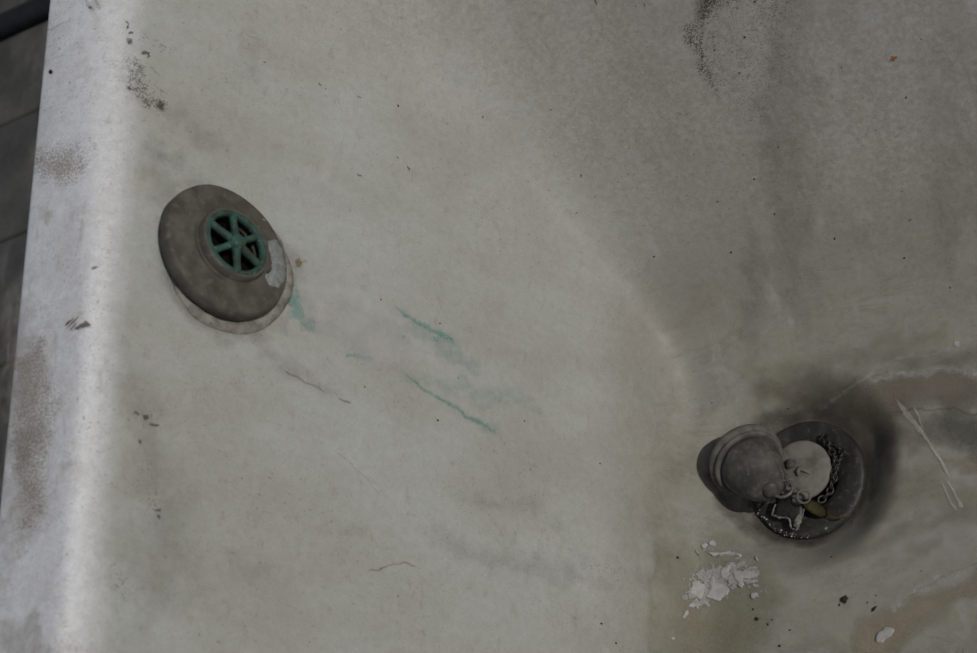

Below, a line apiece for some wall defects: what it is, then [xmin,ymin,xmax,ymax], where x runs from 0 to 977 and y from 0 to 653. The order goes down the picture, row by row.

damp [684,0,720,76]
peeling [680,539,766,619]
damp [857,577,977,653]